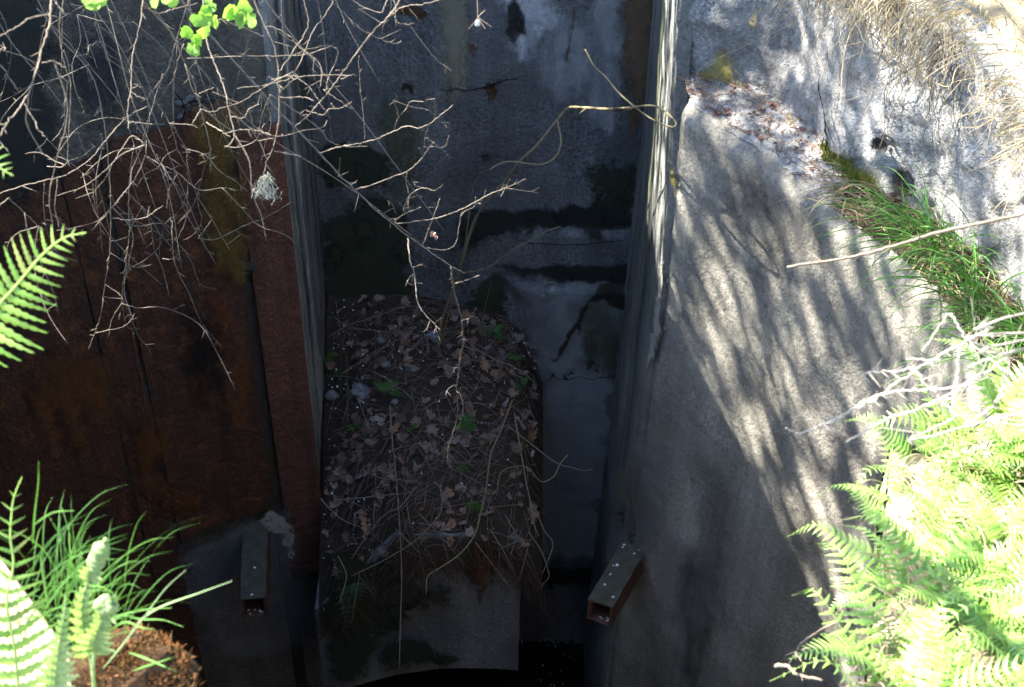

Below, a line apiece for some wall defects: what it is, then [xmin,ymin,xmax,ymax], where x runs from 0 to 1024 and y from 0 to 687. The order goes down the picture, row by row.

damp [378,104,416,190]
crack [438,76,526,92]
crack [818,71,833,162]
rust [193,99,246,282]
damp [458,184,632,248]